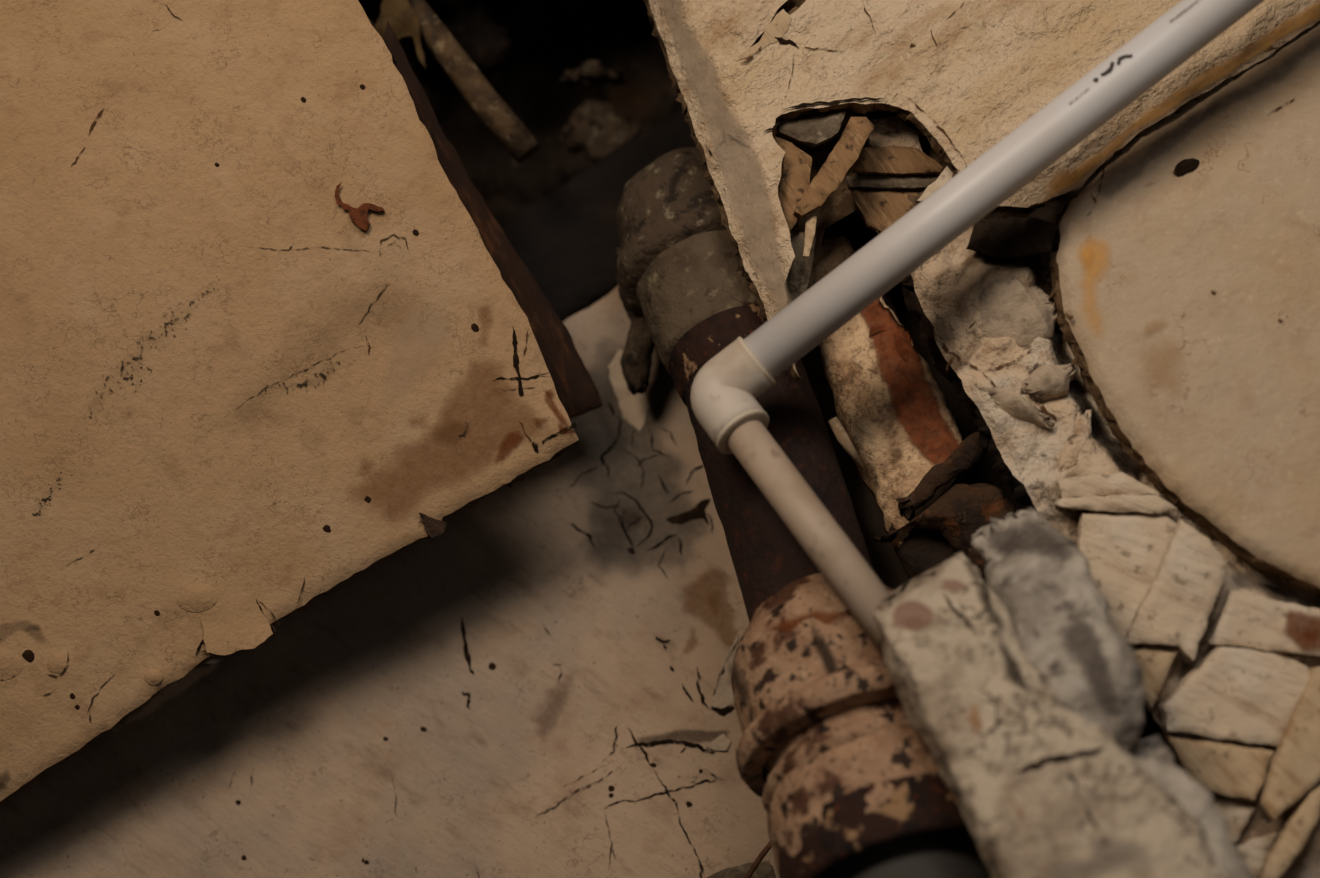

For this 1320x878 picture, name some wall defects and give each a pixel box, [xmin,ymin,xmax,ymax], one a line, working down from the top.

crack [774,37,837,88]
hole [763,93,967,172]
spalling [852,210,879,246]
crack [493,328,577,453]
spalling [887,282,979,440]
crack [570,403,713,578]
spalling [962,451,1024,511]
crack [656,637,730,711]
corrosion [777,612,846,675]
crack [605,726,729,877]